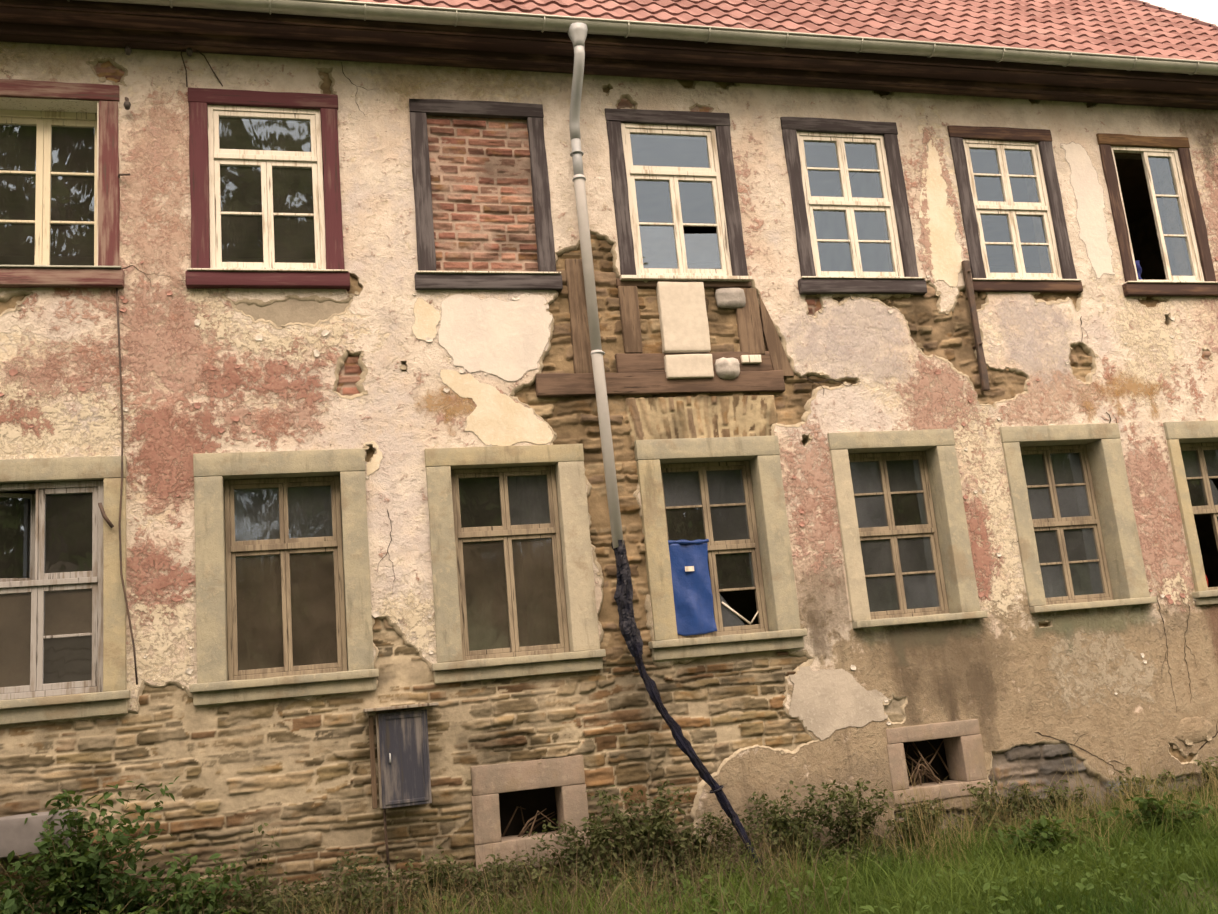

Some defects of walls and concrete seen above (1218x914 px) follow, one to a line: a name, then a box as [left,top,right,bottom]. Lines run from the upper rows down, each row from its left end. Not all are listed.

peeling [1029,142,1115,312]
peeling [0,92,368,513]
flaking render [805,116,1053,629]
flaking render [1068,341,1099,387]
flaking render [0,230,860,914]
flaking render [882,692,908,725]
crack [1034,732,1125,775]
water stain [1049,629,1155,712]
crack [1157,596,1196,709]